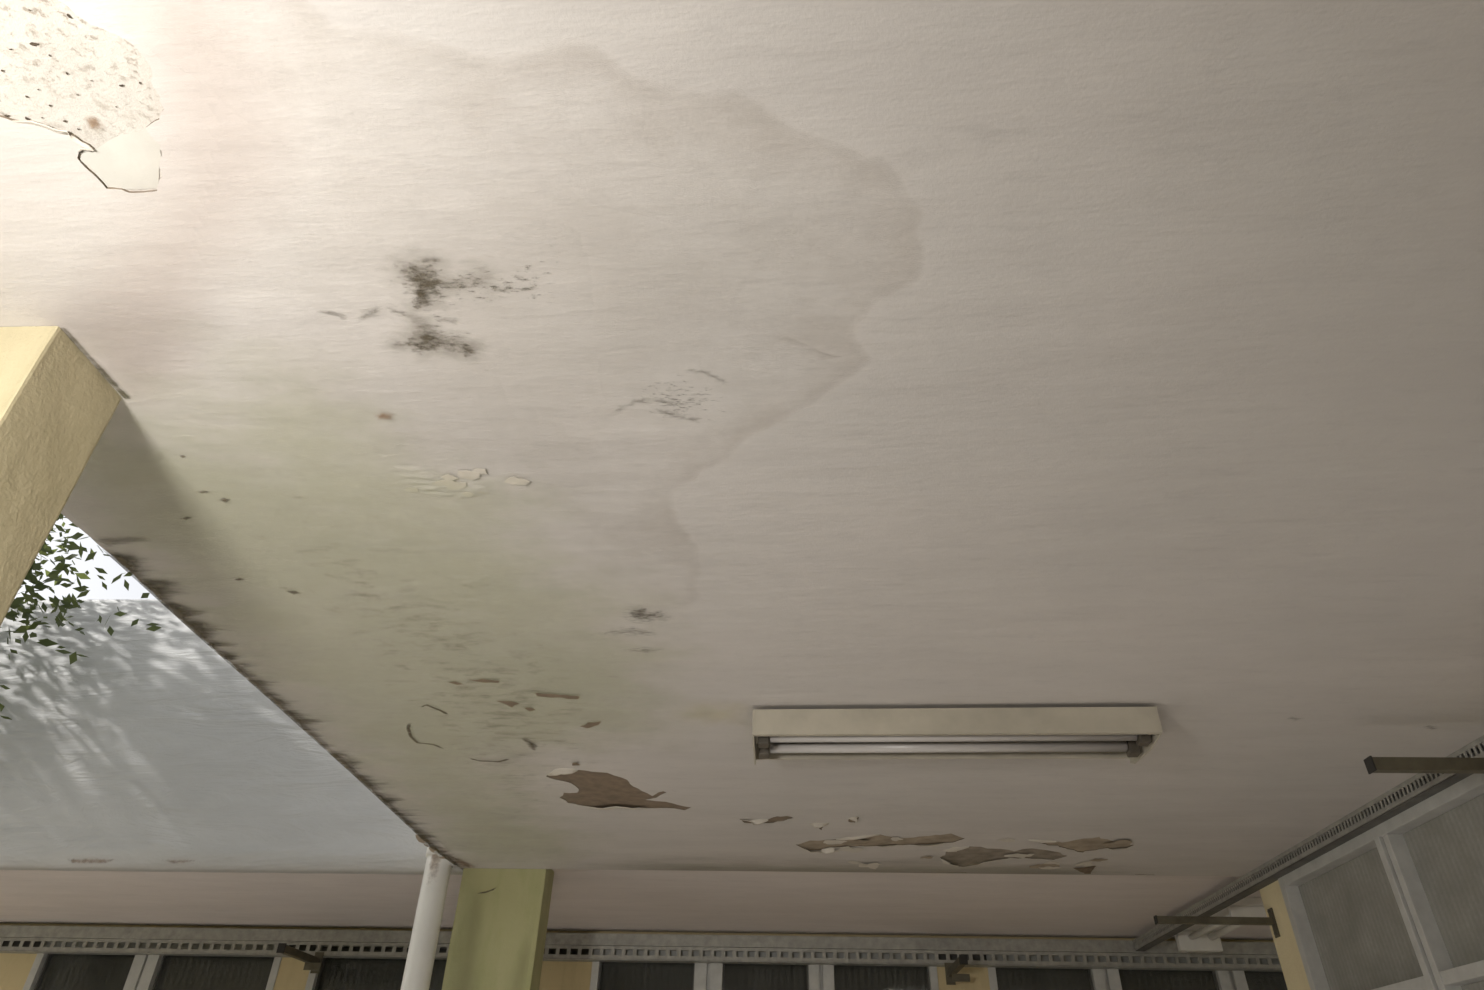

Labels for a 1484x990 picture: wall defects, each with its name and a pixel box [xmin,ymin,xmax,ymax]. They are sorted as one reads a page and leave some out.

peeling [0,0,164,193]
leakage [405,260,438,303]
leakage [66,331,129,398]
leakage [106,540,460,865]
peeling [546,768,691,810]
peeling [740,816,792,825]
peeling [798,816,1133,874]